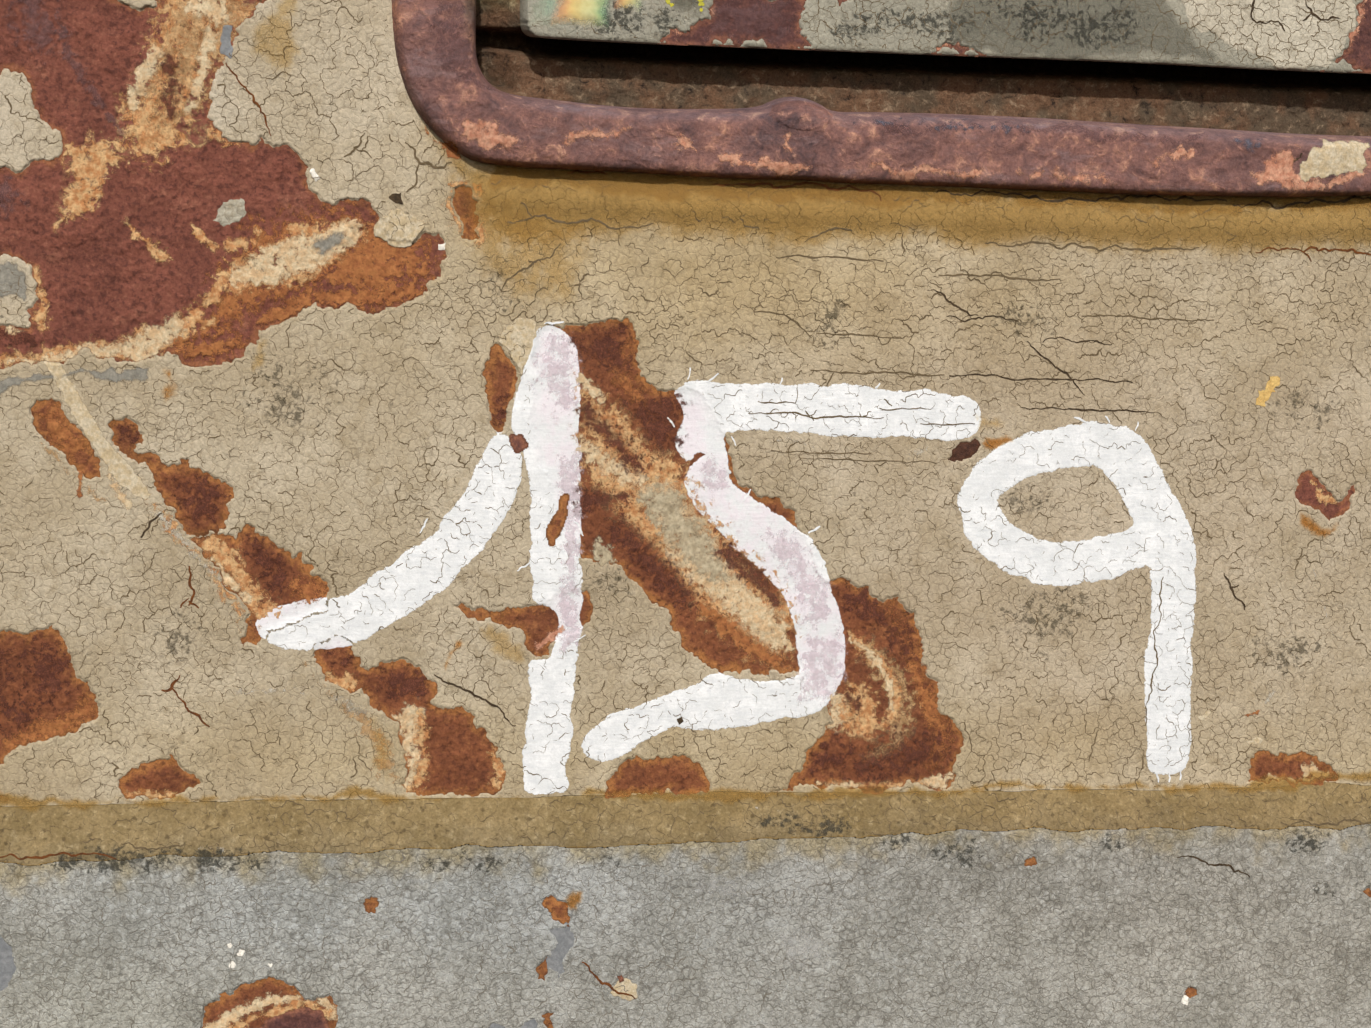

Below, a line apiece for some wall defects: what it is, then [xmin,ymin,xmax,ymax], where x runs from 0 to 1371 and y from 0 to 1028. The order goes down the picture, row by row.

crack [803,0,1356,68]
crack [0,74,61,168]
corrosion [0,0,447,369]
peeling [374,193,425,248]
crack [0,262,35,327]
crack [0,437,62,505]
corrosion [108,418,329,646]
corrosion [547,318,805,676]
corrosion [0,625,99,764]
corrosion [777,577,964,795]
damp [744,807,852,837]
damp [1285,829,1329,852]